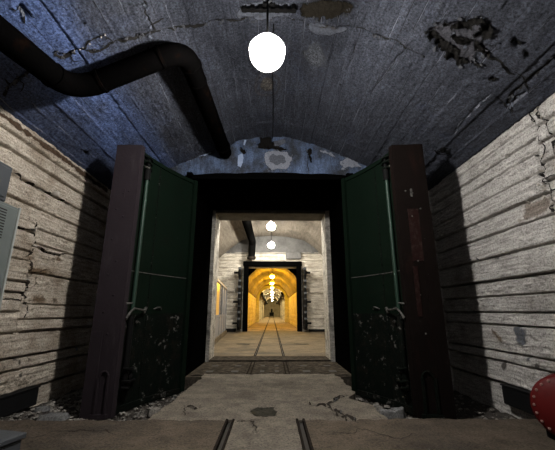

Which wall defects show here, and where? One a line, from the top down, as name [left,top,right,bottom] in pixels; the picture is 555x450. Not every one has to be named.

crack [54,0,262,62]
peeling [236,1,294,23]
spalling [299,0,354,36]
spalling [424,16,515,75]
flaking render [254,137,293,173]
peeling [340,157,362,171]
crack [3,222,65,318]
water stain [514,325,526,345]
crack [309,395,412,439]